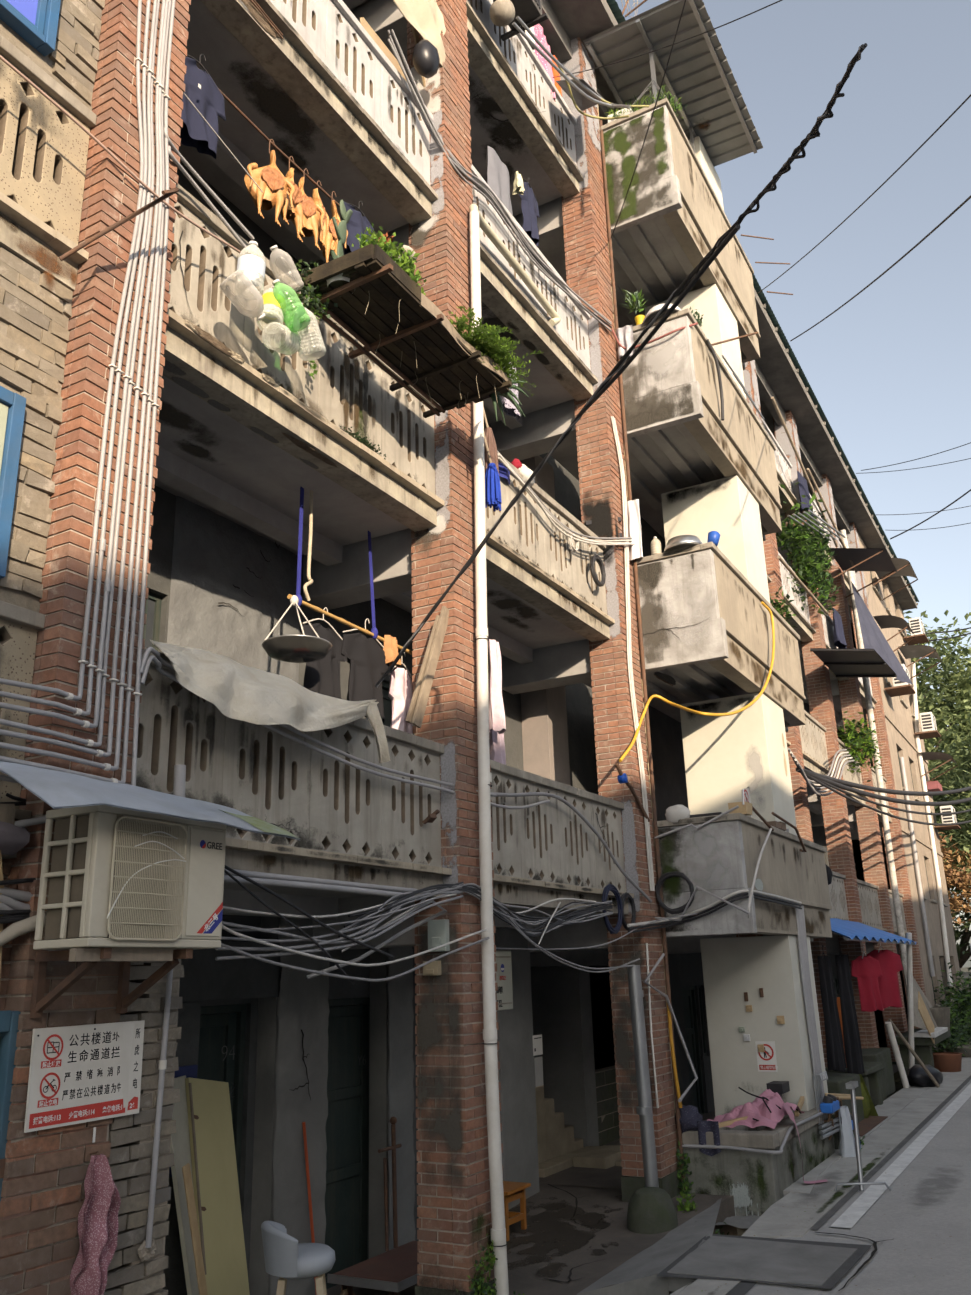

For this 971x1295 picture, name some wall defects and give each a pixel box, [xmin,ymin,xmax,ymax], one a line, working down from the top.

water stain [232,66,315,173]
water stain [603,106,672,226]
water stain [159,401,215,461]
water stain [637,559,700,662]
crack [289,1029,311,1100]